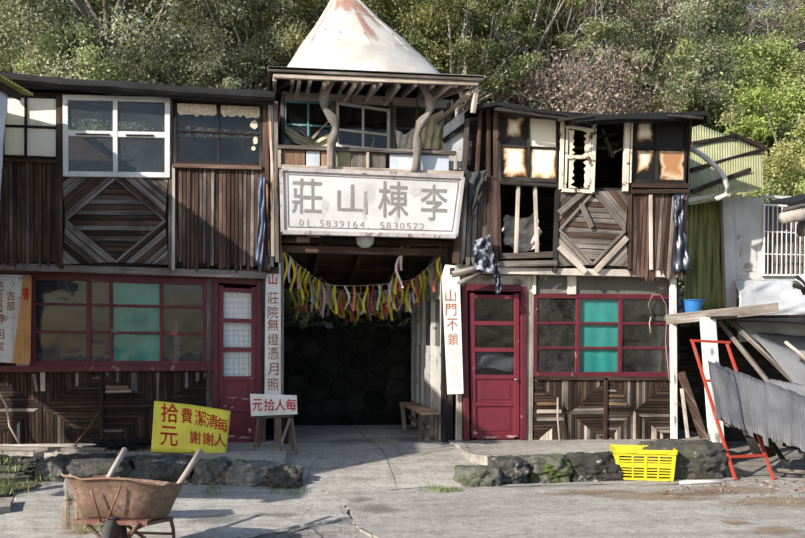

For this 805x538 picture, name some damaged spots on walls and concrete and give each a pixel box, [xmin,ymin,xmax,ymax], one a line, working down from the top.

corrosion [305,0,374,41]
crack [299,431,542,490]
crack [254,504,374,538]